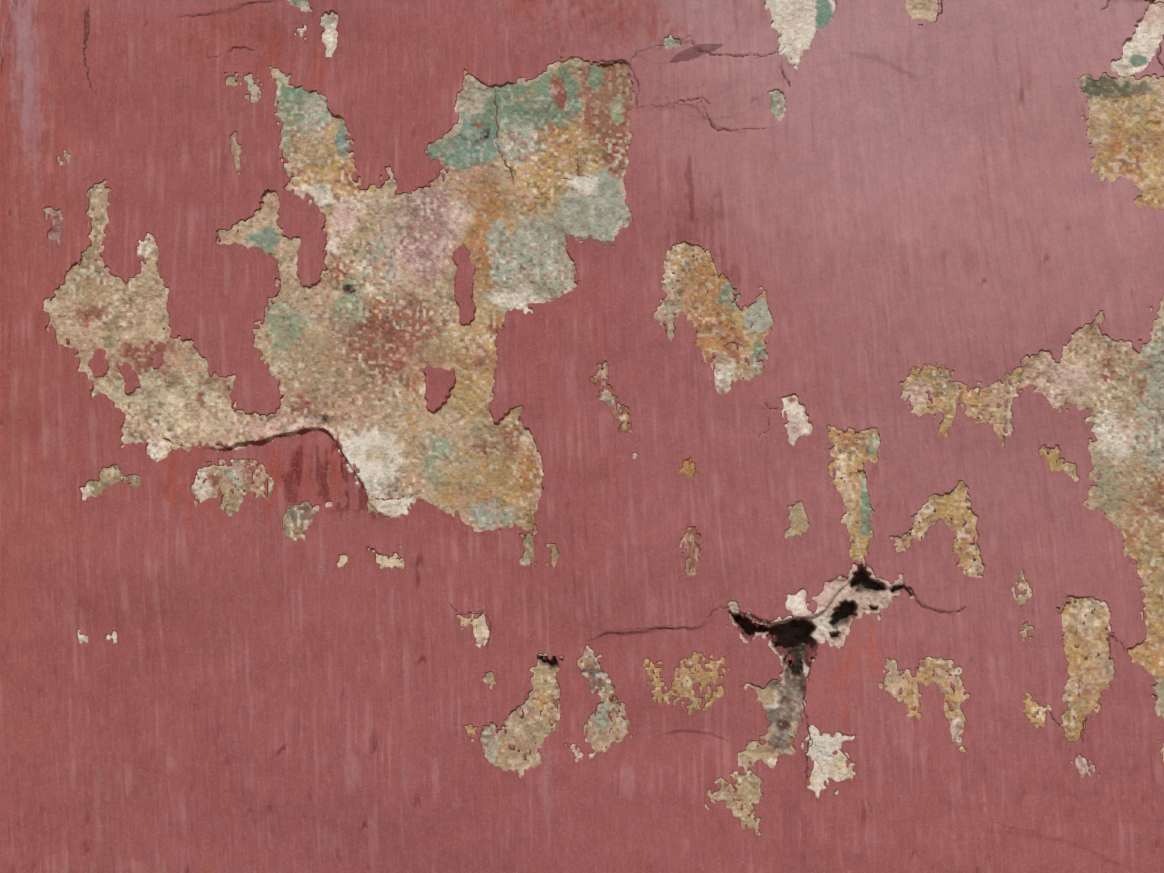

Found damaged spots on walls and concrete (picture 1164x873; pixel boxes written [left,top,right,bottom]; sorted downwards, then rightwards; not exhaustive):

flaking render [765,0,835,70]
peeling [1078,0,1164,211]
peeling [43,57,635,569]
peeling [653,242,774,395]
peeling [890,296,1164,719]
peeling [464,653,563,779]
peeling [564,645,632,763]
flaking render [705,425,915,836]
crack [802,647,856,785]
peeling [878,657,970,752]
crack [912,593,966,614]
peeling [1022,596,1115,779]